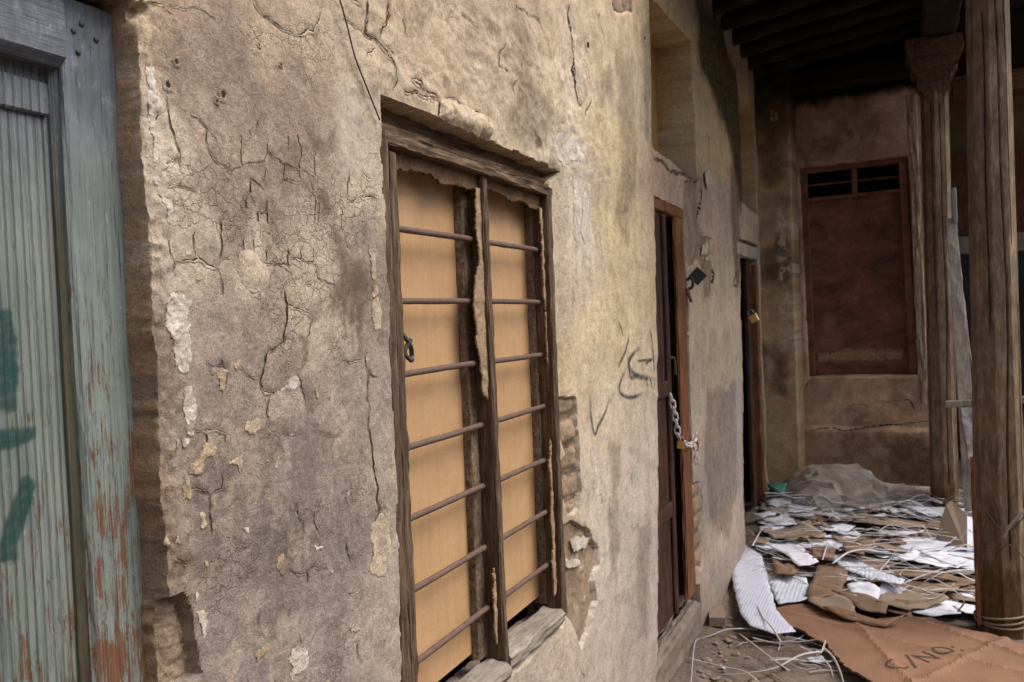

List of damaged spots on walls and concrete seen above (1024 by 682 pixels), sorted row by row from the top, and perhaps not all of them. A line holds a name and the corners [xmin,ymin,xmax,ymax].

crack [253,0,480,116]
crack [561,4,592,124]
flaking render [145,67,173,225]
flaking render [165,292,192,374]
crack [155,96,375,437]
crack [652,152,728,285]
crack [343,354,381,520]
crack [812,399,928,431]
flaking render [369,513,392,577]
flaking render [559,398,595,641]